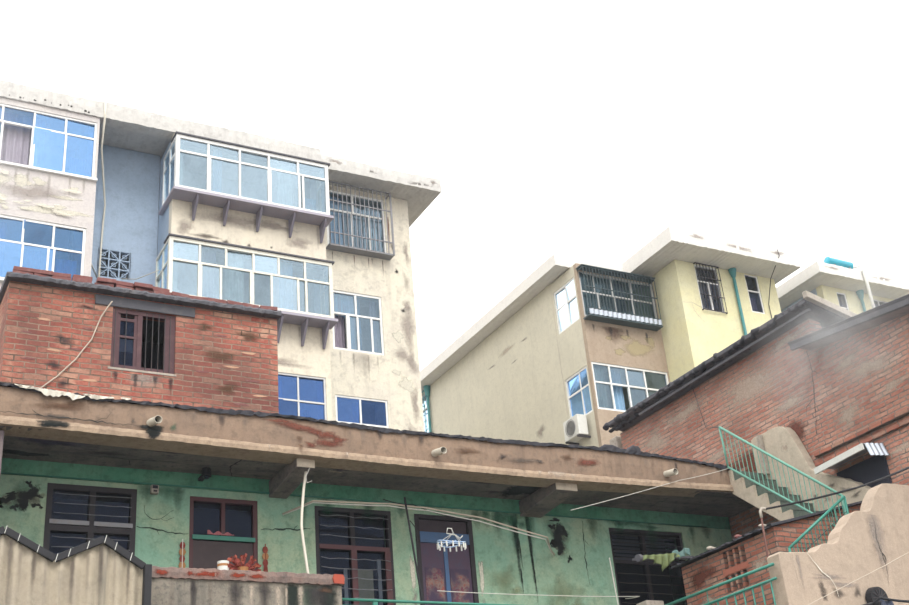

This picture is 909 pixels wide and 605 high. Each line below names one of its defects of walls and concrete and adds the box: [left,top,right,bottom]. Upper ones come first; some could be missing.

peeling [0,170,88,217]
damp [3,439,78,456]
damp [132,420,175,439]
flaking render [269,419,344,447]
peeling [0,481,43,511]
crack [136,505,183,534]
damp [473,512,537,591]
peeling [548,518,572,563]